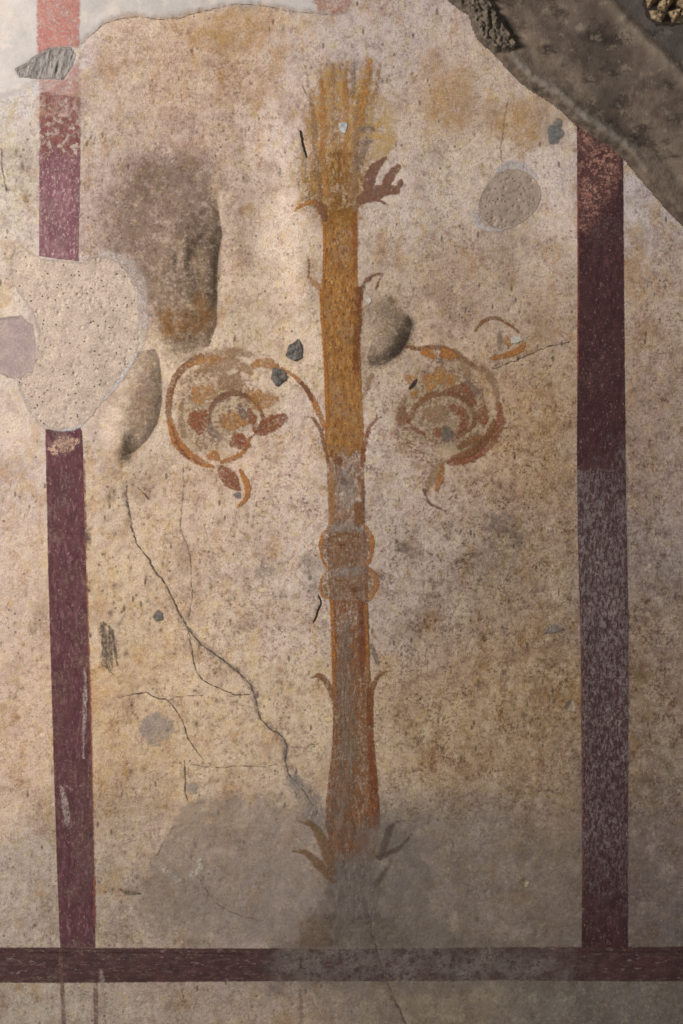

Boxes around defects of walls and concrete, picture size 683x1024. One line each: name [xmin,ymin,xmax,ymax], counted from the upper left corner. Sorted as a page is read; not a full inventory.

spalling [451,0,519,53]
spalling [15,47,76,80]
spalling [548,119,564,144]
peeling [573,129,620,231]
crack [101,461,317,813]